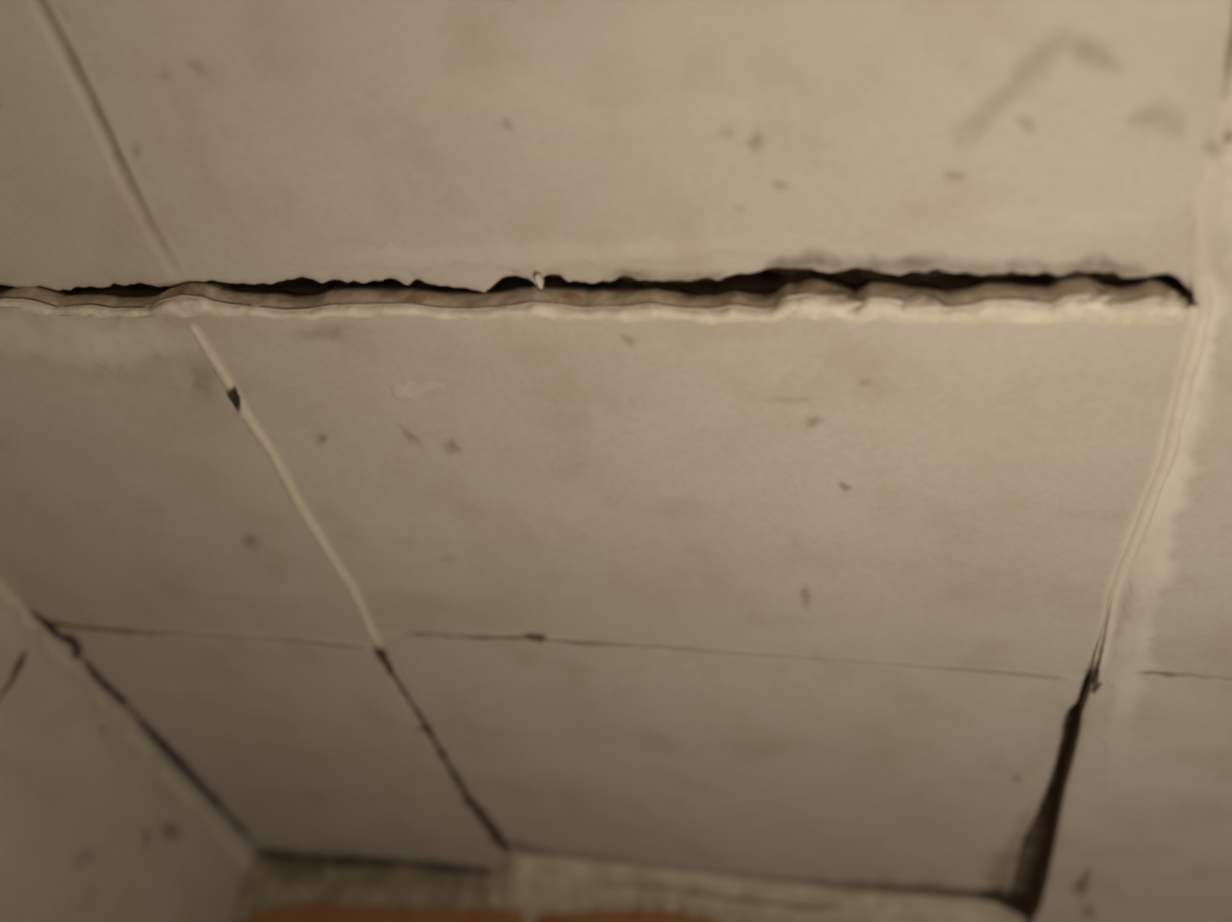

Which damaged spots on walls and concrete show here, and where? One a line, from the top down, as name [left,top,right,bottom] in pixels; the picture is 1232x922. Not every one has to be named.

crack [0,270,1190,326]
crack [28,609,510,876]
crack [931,649,1103,917]